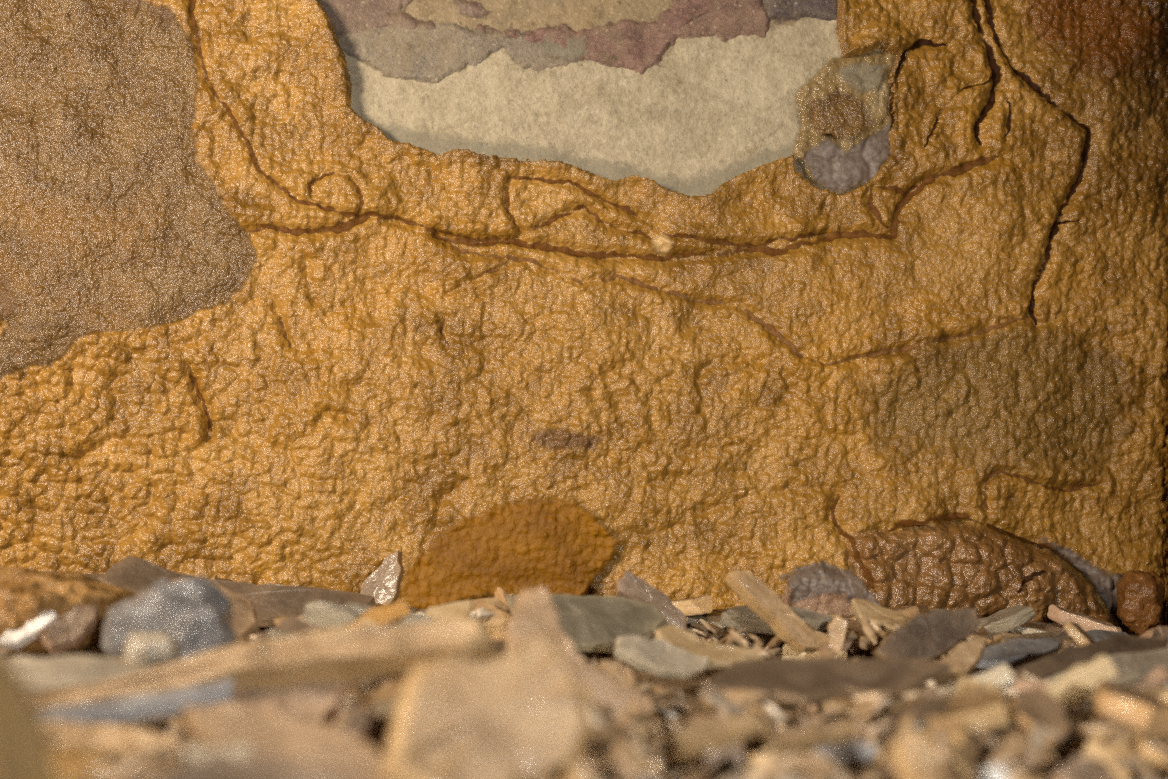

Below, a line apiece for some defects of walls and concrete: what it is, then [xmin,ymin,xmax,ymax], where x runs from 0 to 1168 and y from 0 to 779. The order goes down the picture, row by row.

damp [0,0,256,375]
spalling [317,0,896,197]
crack [188,0,1091,366]